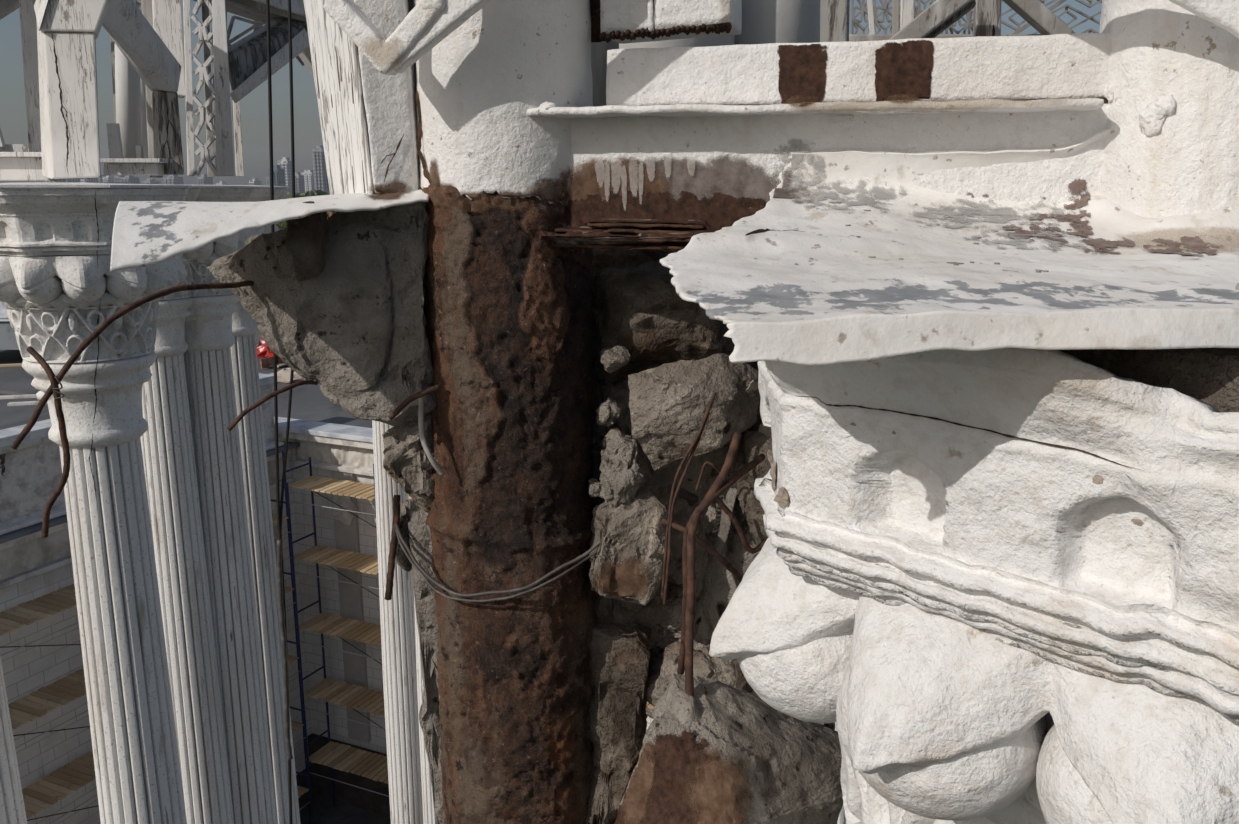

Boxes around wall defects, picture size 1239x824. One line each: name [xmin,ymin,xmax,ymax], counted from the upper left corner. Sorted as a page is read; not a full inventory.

crack [52,35,69,176]
corrosion [777,44,827,107]
corrosion [875,40,934,103]
crack [92,190,100,269]
peeling [771,139,1220,264]
crack [89,299,101,501]
spalling [227,380,318,431]
crack [798,396,1144,471]
spalling [661,393,789,697]
corrosion [615,731,752,824]